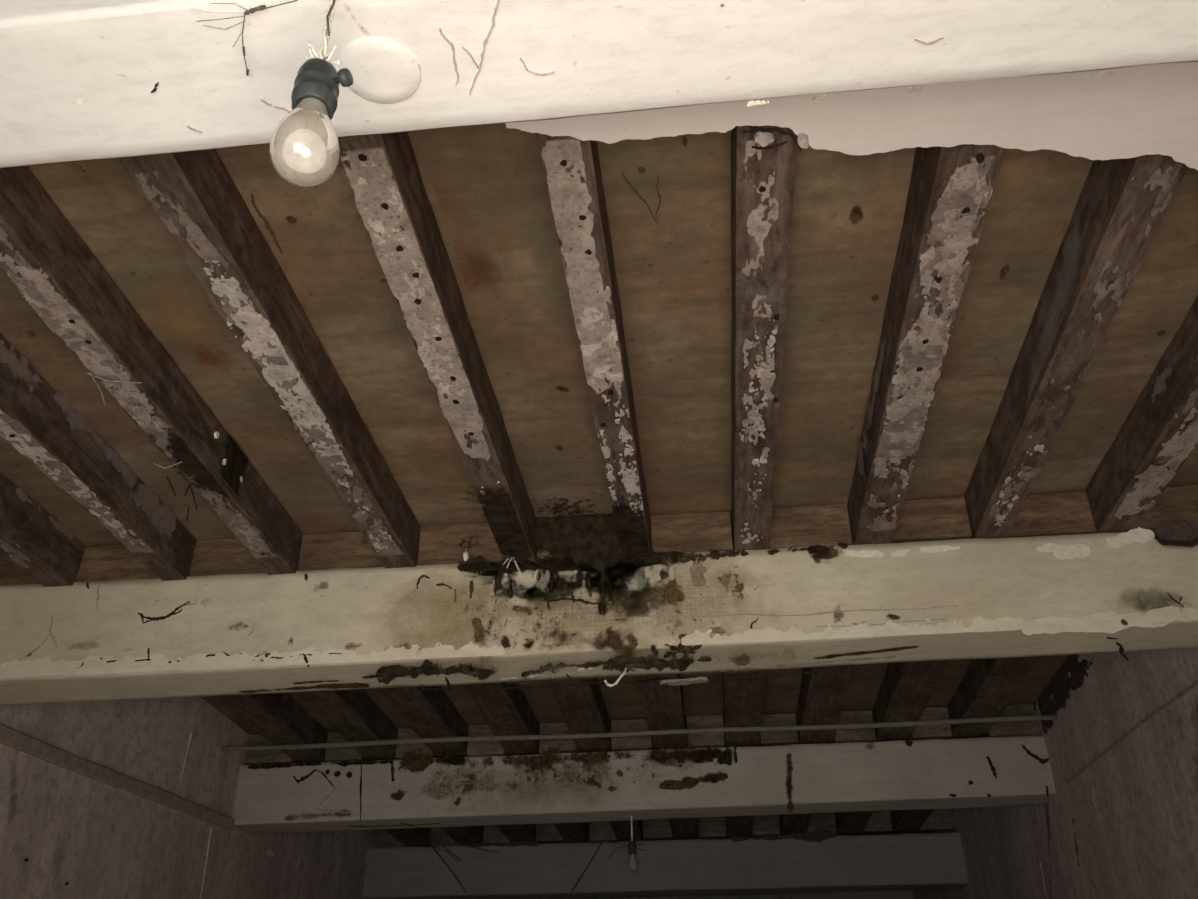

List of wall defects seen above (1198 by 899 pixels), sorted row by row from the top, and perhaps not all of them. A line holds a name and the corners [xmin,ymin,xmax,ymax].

crack [439,0,499,96]
crack [520,58,554,76]
peeling [341,147,491,461]
flaking render [506,62,1198,549]
peeling [0,218,278,558]
peeling [135,170,404,556]
flaking render [0,641,506,679]
leakage [440,488,767,683]
flaking render [842,545,960,558]
flaking render [681,605,1198,646]
flaking render [1037,543,1091,560]
leakage [248,743,738,797]